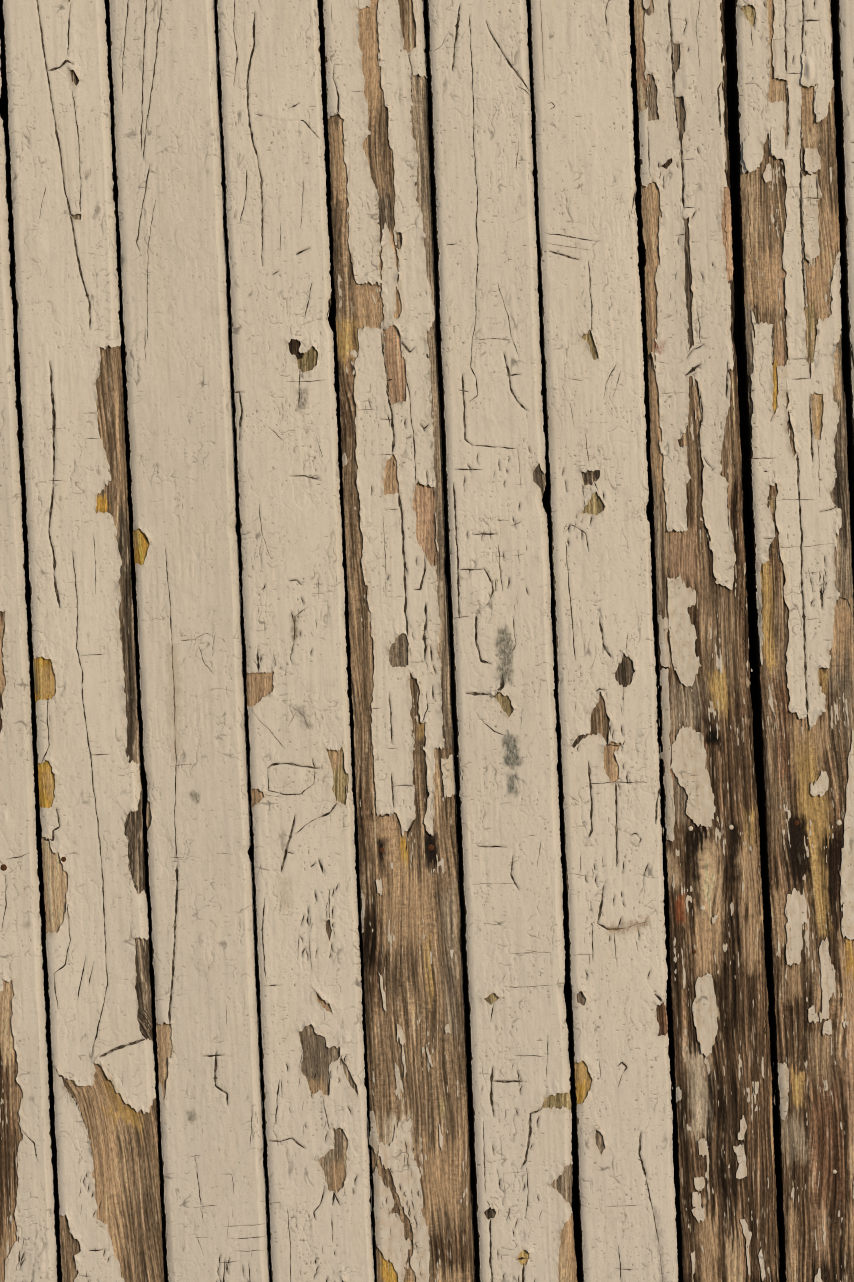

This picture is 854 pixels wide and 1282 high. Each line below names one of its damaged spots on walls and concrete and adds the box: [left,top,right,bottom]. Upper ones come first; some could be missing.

crack [36,0,91,326]
crack [233,1,309,275]
crack [292,64,361,138]
crack [363,0,555,736]
peeling [95,345,152,895]
peeling [299,0,496,1282]
crack [474,835,541,890]
peeling [572,692,621,782]
peeling [639,0,854,1282]
peeling [0,980,23,1282]
peeling [52,937,173,1282]
crack [195,1052,421,1282]